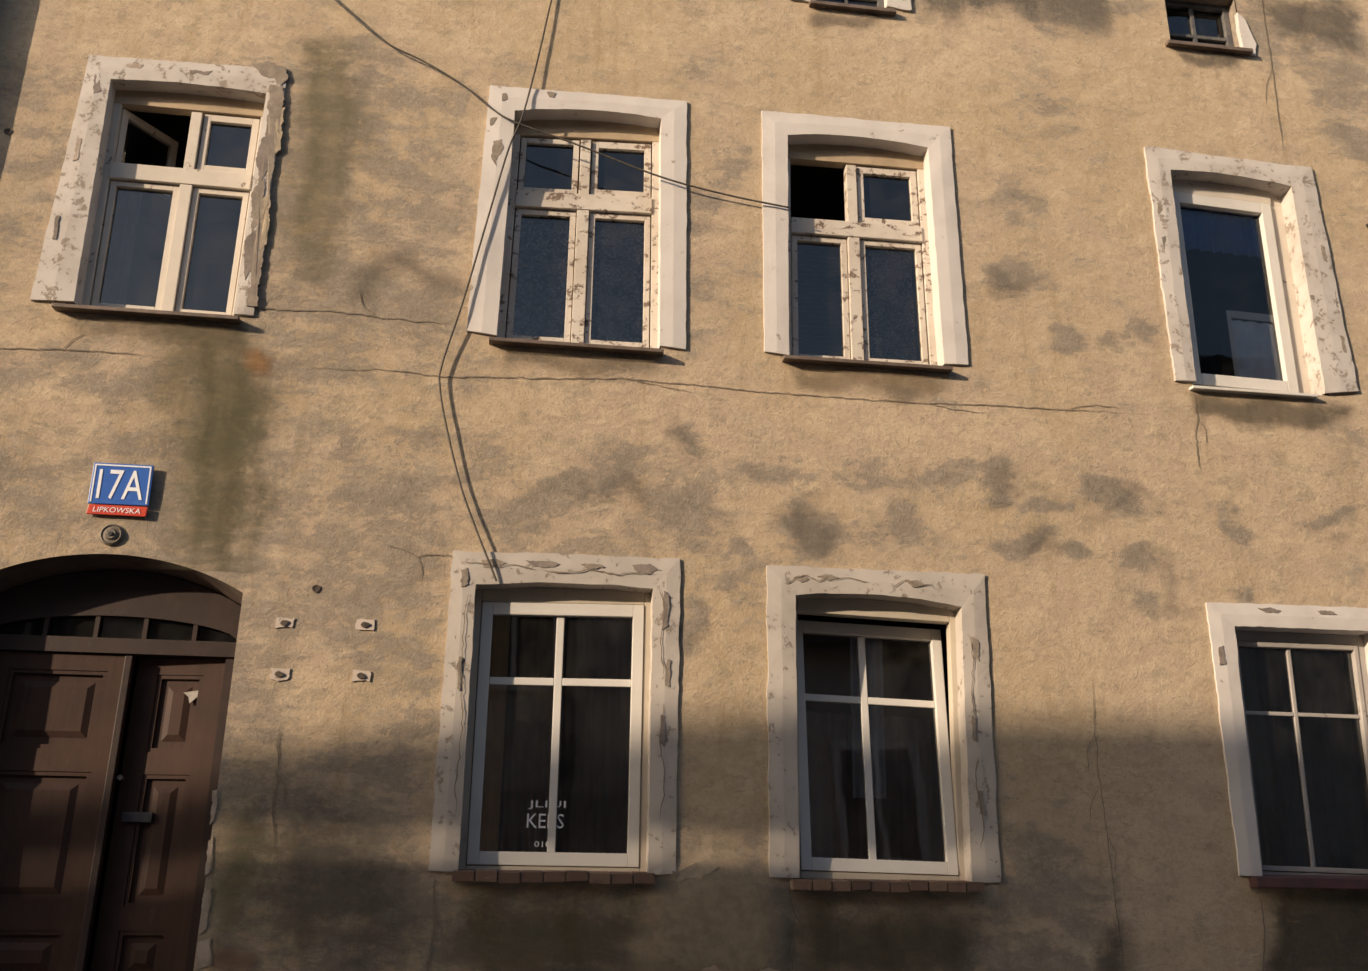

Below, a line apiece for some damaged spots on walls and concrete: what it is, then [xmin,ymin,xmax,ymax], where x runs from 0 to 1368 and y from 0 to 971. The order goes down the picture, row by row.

flaking render [244,61,289,308]
peeling [52,215,60,240]
crack [1087,681,1124,970]
water stain [812,919,967,971]
water stain [1267,893,1368,971]